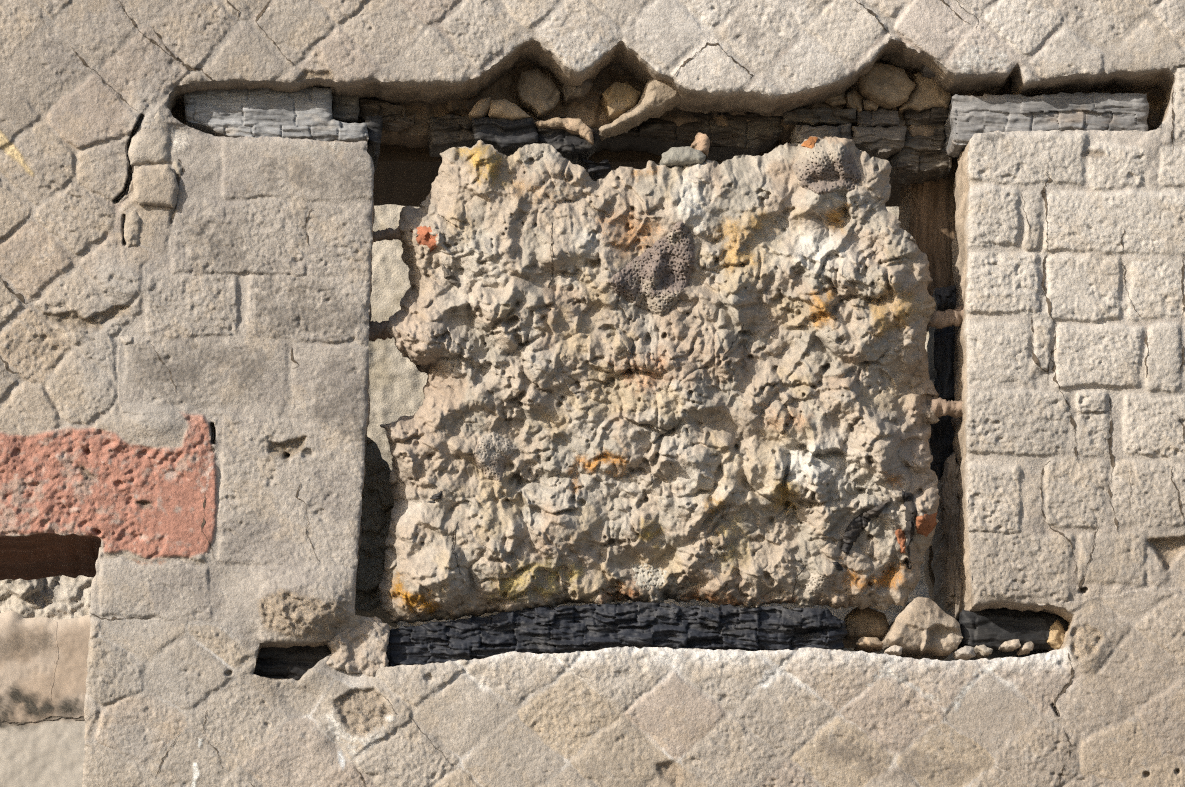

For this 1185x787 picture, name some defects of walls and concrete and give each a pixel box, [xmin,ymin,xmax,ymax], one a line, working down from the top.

spalling [296,71,332,82]
crack [70,46,142,244]
crack [1021,156,1132,590]
crack [150,711,223,787]
crack [1053,653,1074,785]